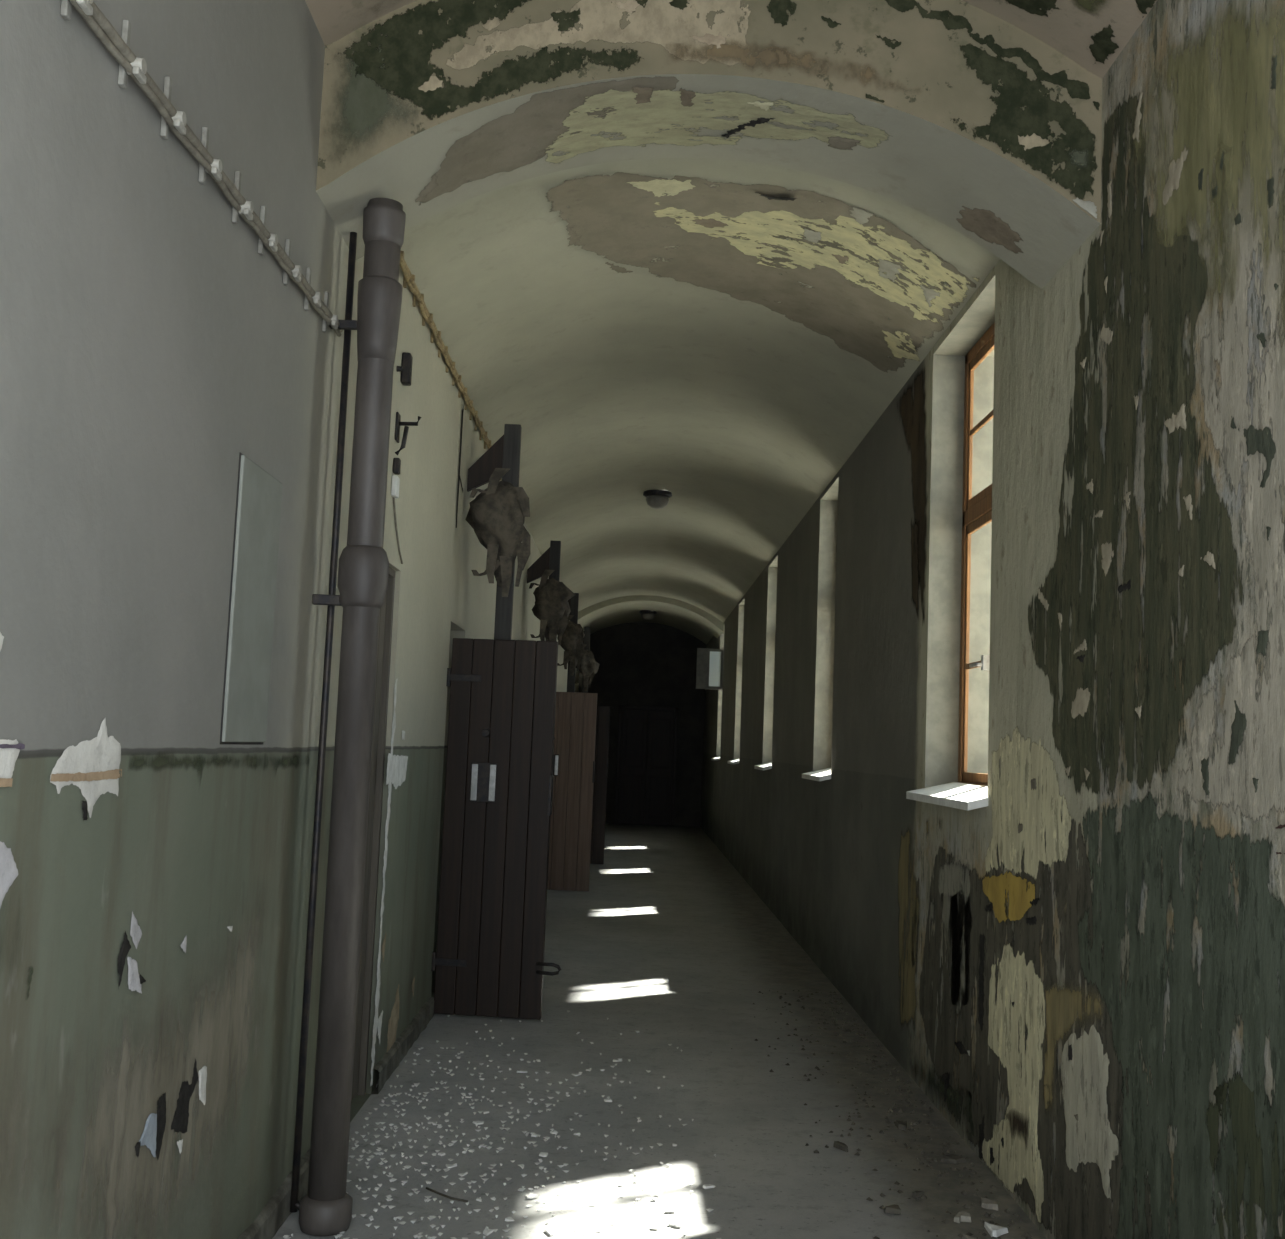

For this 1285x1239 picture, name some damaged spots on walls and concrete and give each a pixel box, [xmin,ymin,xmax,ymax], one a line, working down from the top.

peeling [446,0,751,70]
peeling [545,87,890,163]
peeling [627,179,980,323]
peeling [985,39,1285,879]
peeling [0,739,25,787]
peeling [50,718,122,820]
leakage [130,754,299,776]
peeling [0,841,18,908]
leakage [77,928,255,1239]
spalling [135,1059,207,1160]
peeling [979,943,1046,1223]
peeling [1061,1024,1119,1199]